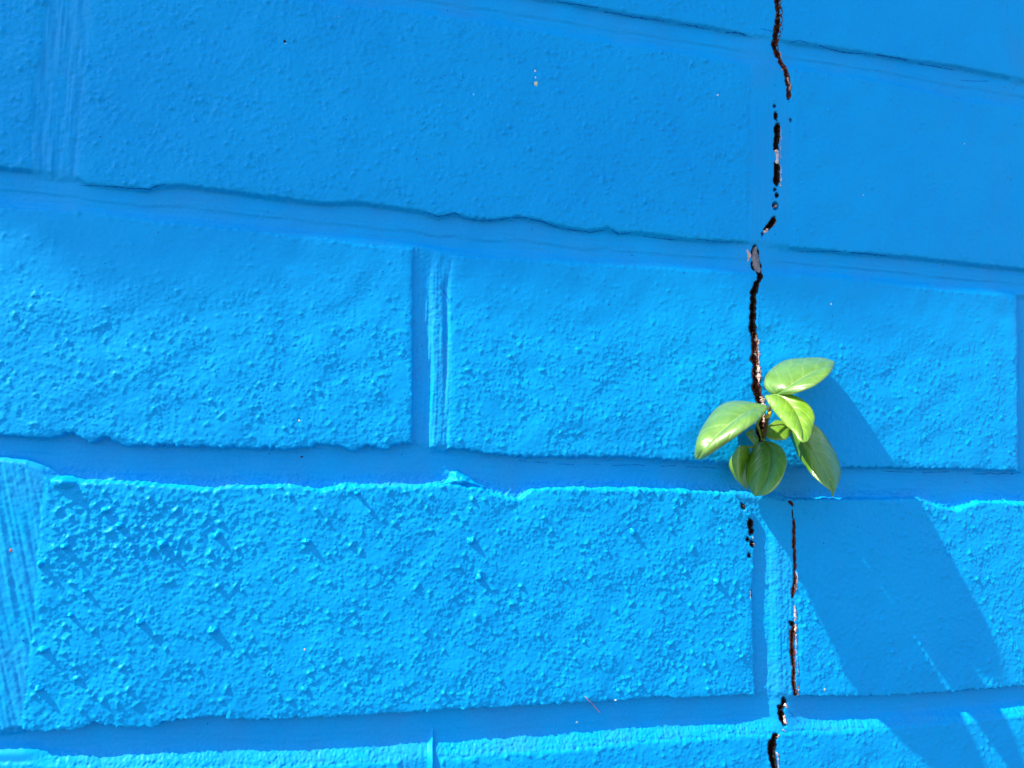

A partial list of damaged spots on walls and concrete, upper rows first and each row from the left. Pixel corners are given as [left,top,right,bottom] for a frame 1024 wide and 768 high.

crack [424,0,968,442]
crack [741,504,754,557]
crack [767,501,800,768]